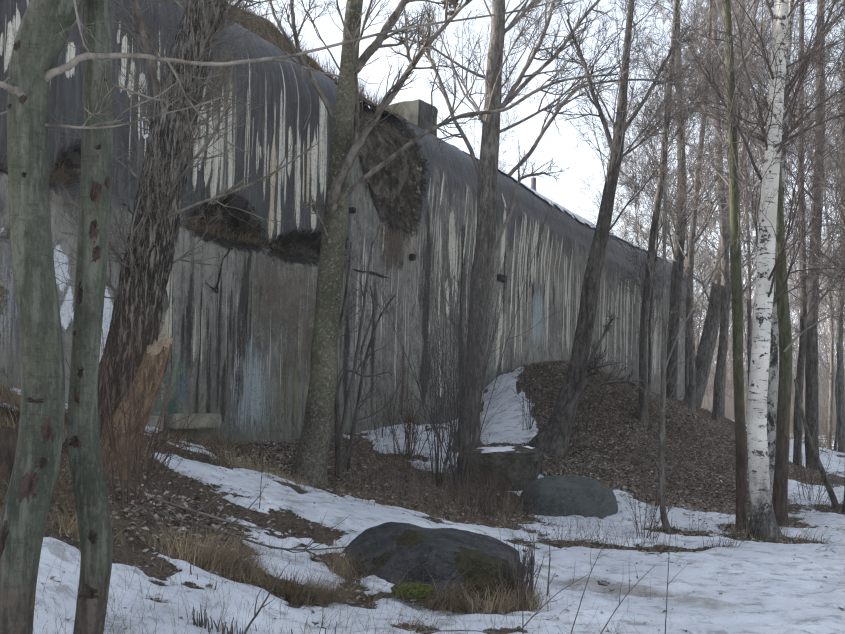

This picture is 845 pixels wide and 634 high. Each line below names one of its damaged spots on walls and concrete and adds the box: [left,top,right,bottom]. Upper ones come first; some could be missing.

leakage [0,0,29,74]
leakage [65,42,77,79]
leakage [117,24,147,157]
leakage [192,58,327,240]
spalling [354,99,431,238]
peeling [0,247,19,352]
leakage [158,253,309,437]
leakage [343,165,477,403]
leakage [495,193,587,372]
leakage [598,277,641,370]
leakage [651,303,669,377]